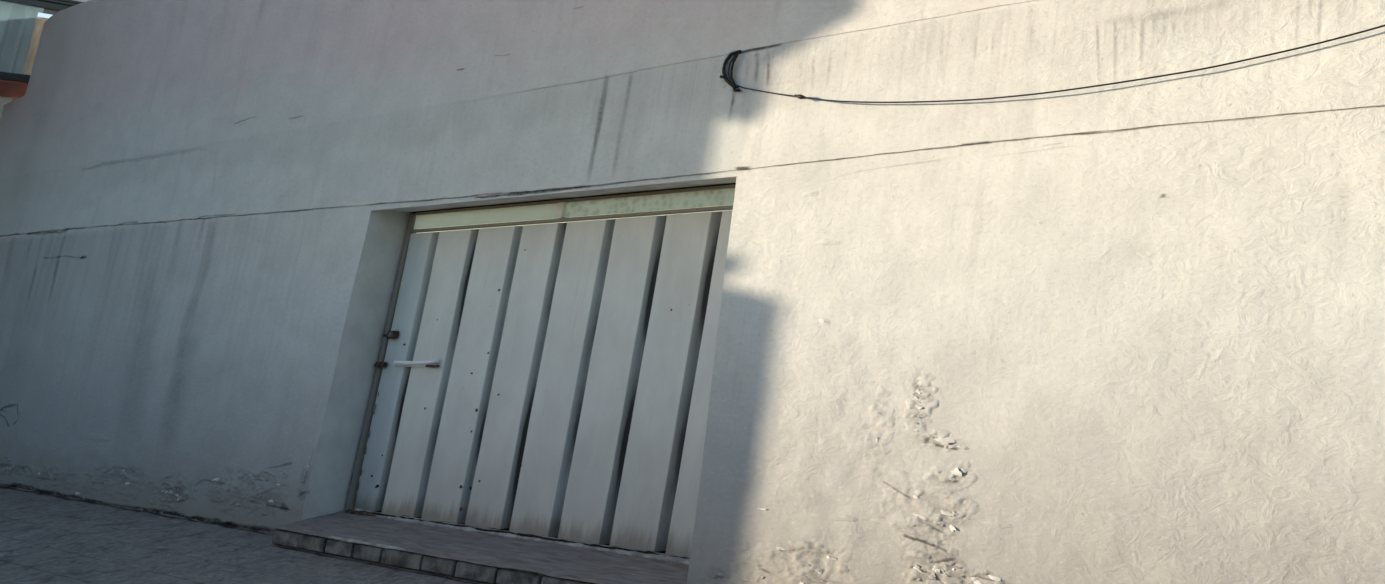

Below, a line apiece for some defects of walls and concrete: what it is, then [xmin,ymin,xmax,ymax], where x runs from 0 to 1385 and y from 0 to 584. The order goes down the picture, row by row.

peeling [862,370,1011,584]